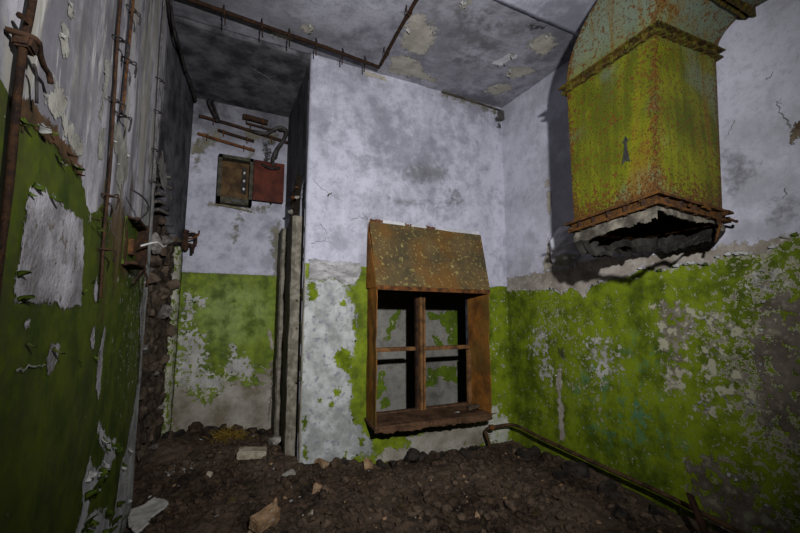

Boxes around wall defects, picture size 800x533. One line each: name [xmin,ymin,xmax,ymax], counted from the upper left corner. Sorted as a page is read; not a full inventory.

peeling [20,73,85,178]
peeling [59,0,77,58]
peeling [364,13,437,83]
peeling [484,33,562,95]
peeling [14,182,112,310]
peeling [76,151,274,533]
peeling [299,277,510,464]
flaking render [507,232,800,452]